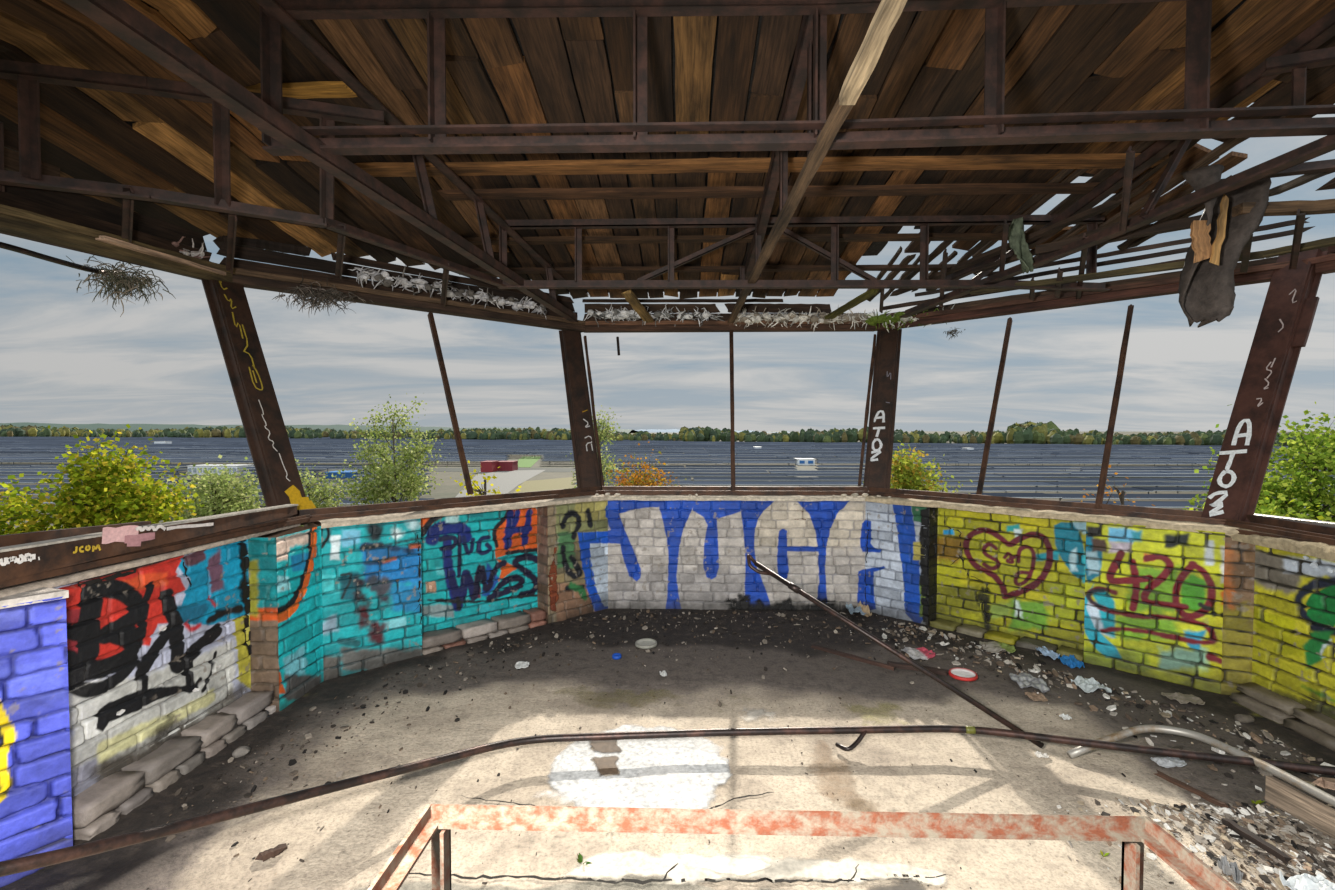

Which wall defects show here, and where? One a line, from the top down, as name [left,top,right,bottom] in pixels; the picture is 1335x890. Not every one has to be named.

crack [409,863,948,885]